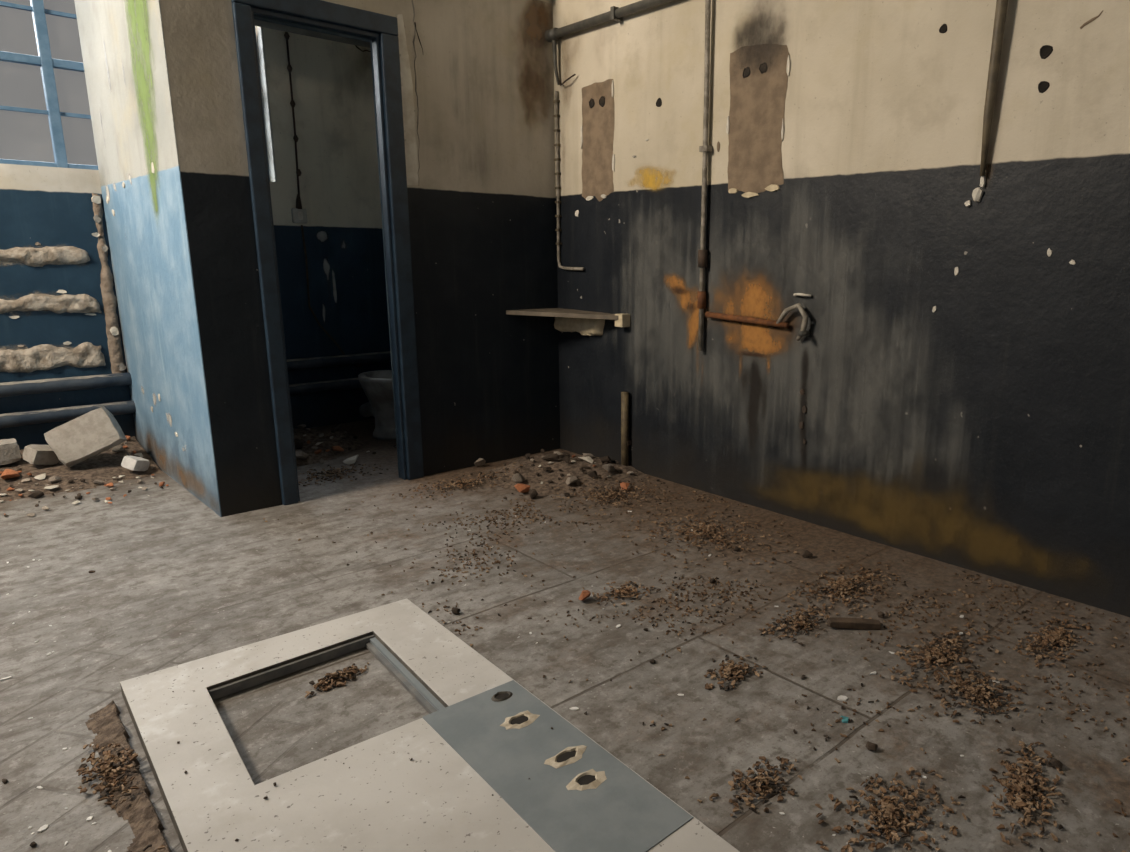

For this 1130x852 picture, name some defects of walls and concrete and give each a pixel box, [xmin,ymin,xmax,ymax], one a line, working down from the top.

damp [521,0,553,114]
corrosion [666,275,705,348]
corrosion [715,281,784,369]
damp [769,353,1050,574]